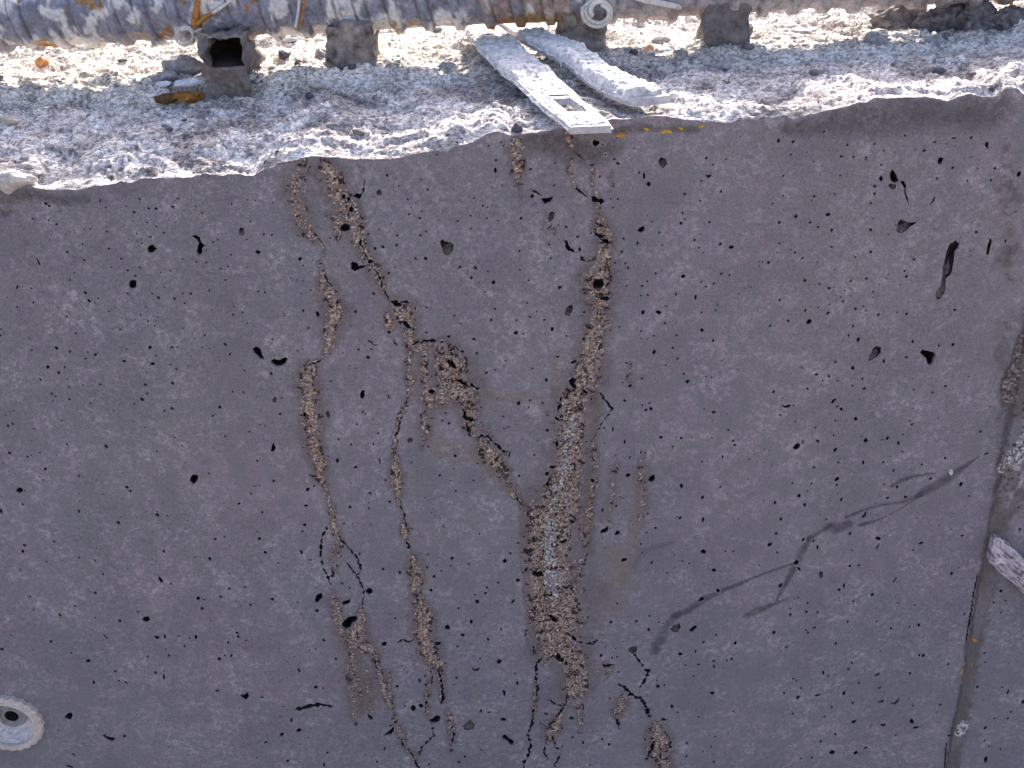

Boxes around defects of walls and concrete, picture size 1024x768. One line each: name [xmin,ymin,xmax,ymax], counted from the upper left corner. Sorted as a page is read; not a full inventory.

peeling [155,78,203,88]
crack [964,576,978,649]
crack [295,702,333,711]